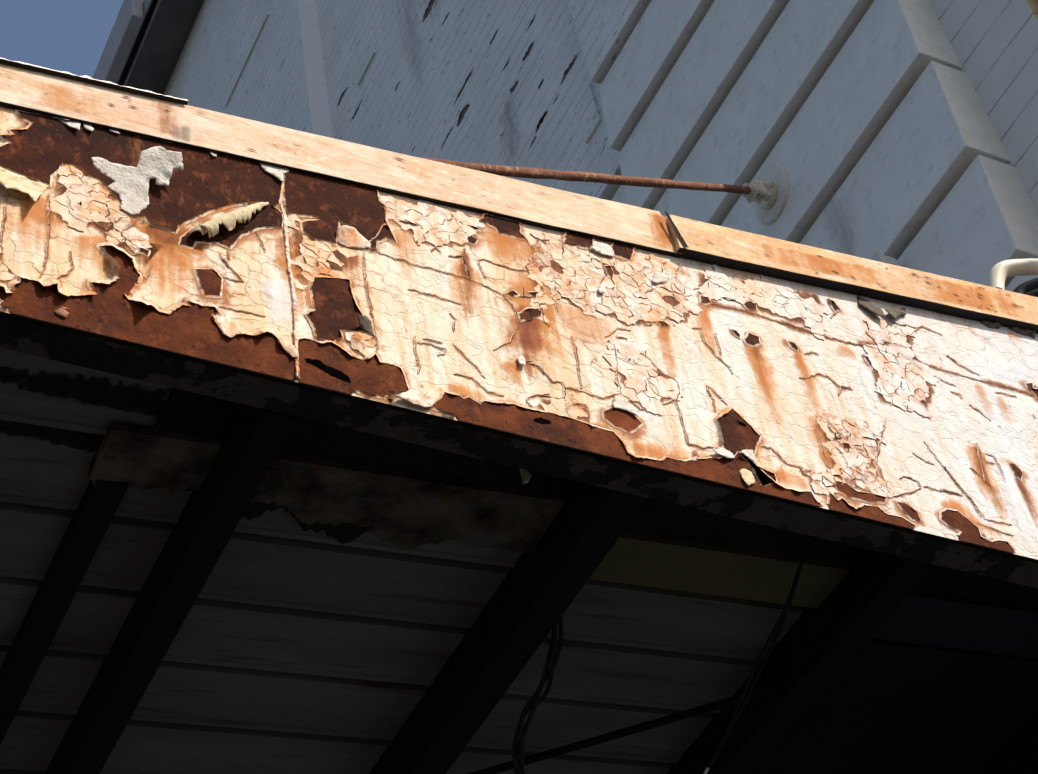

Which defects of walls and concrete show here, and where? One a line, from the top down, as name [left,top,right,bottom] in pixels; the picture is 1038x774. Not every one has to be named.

peeling [0,109,420,252]
rust [79,225,204,290]
peeling [466,212,529,248]
peeling [562,232,638,293]
damp [0,367,172,417]
peeling [0,242,925,529]
crack [287,195,1035,535]
rust [746,347,775,409]
damp [0,423,105,451]
rust [969,446,999,502]
rust [1015,477,1034,518]
peeling [936,508,1016,553]